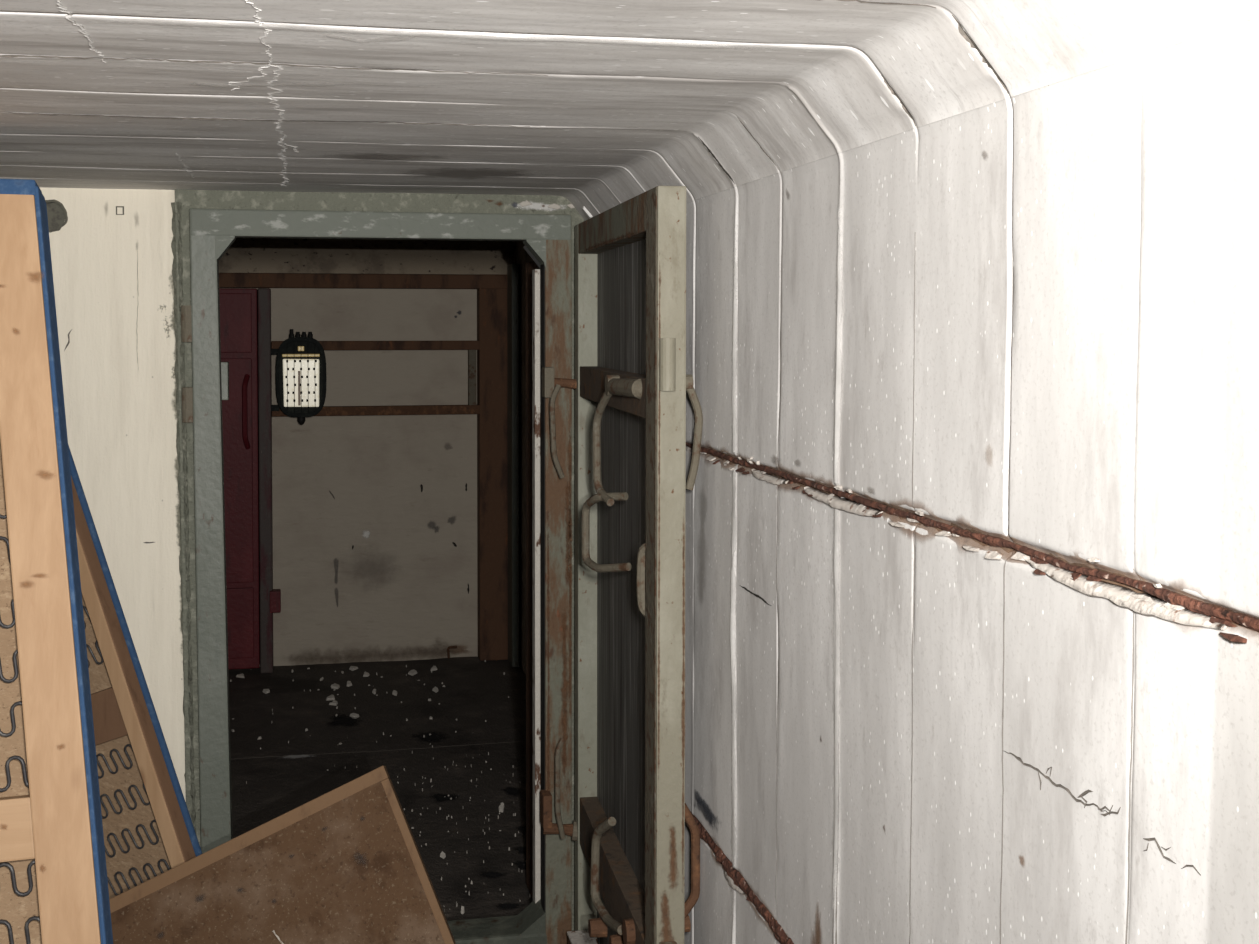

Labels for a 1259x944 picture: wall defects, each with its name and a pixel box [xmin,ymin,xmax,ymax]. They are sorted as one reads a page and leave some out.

crack [0,0,548,185]
spalling [686,237,1259,944]
crack [1000,523,1201,944]